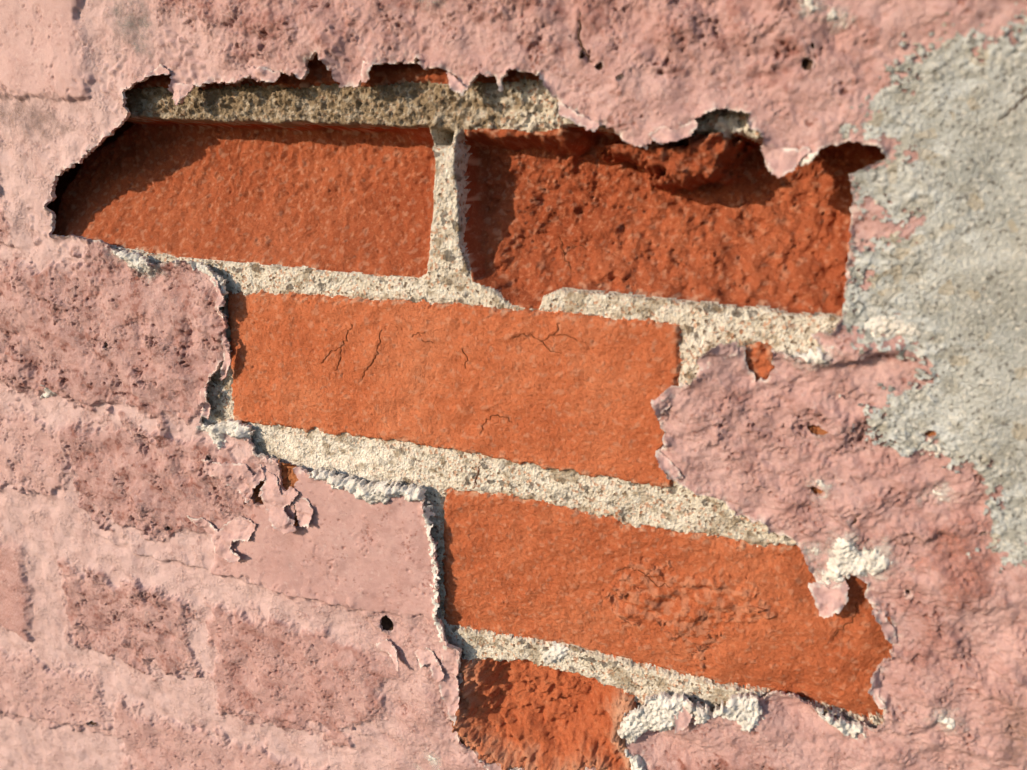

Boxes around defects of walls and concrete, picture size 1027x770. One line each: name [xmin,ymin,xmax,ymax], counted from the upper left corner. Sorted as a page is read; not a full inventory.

crack [322,324,352,371]
peeling [52,53,897,770]